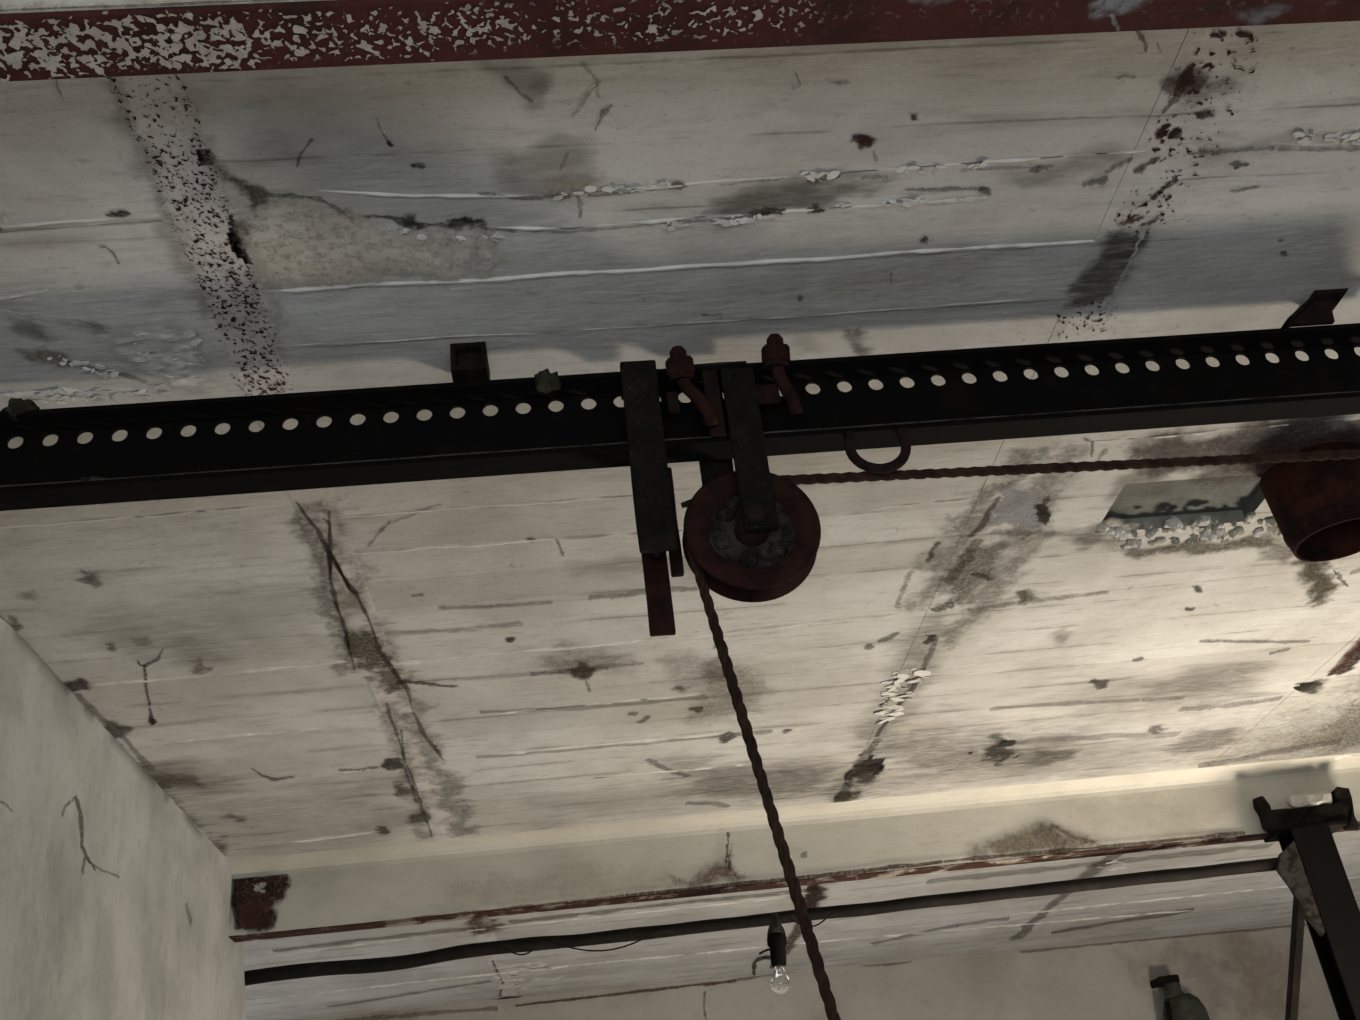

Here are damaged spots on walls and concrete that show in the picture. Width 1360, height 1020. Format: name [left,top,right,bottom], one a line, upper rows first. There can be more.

spalling [0,0,812,405]
leakage [1056,229,1148,339]
spalling [1077,512,1282,559]
crack [137,649,163,725]
crack [296,501,458,837]
leakage [983,734,1015,766]
leakage [1032,751,1072,766]
crack [64,795,95,873]
corrosion [231,824,1245,934]
corrosion [785,924,801,955]
corrosion [489,961,737,1006]